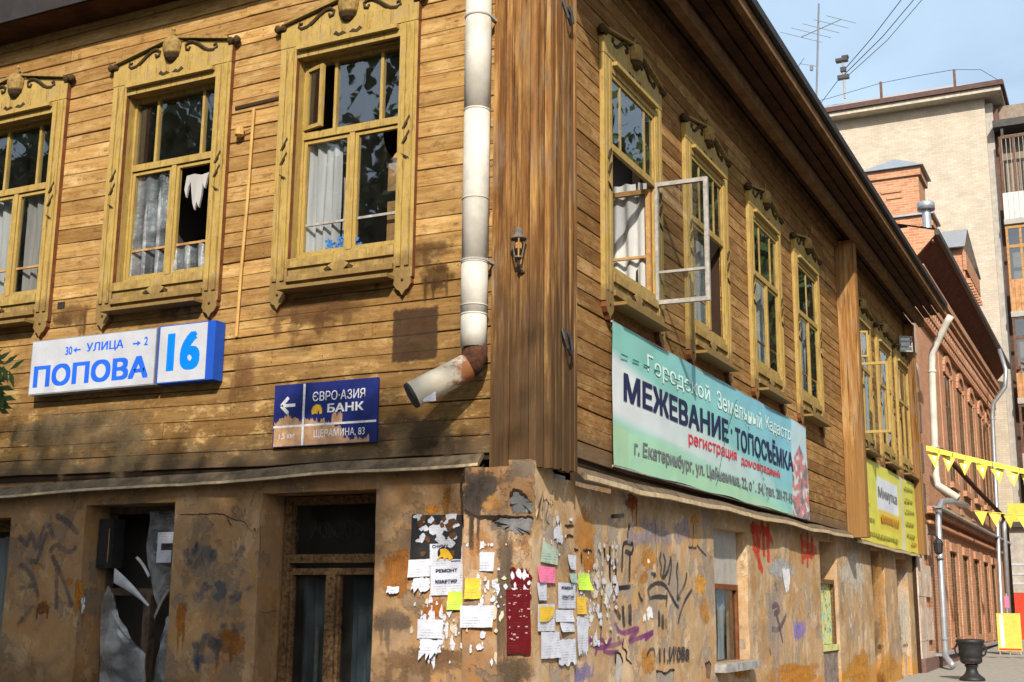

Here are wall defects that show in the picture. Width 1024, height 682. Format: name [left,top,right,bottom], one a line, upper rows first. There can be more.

crack [179,513,261,548]
flaking render [483,462,555,535]